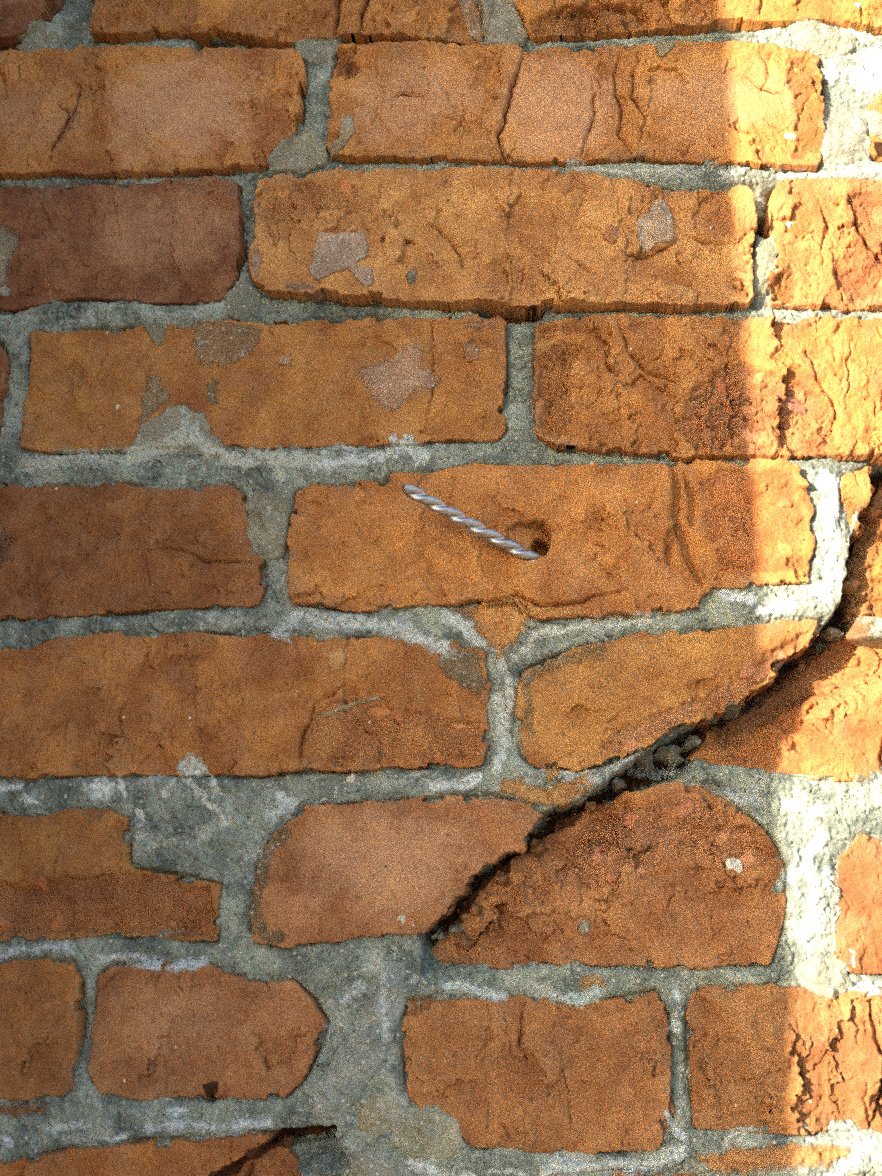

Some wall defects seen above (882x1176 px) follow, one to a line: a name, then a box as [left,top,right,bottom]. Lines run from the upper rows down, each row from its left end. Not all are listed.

crack [623,336,670,382]
crack [430,467,882,951]
crack [519,1014,527,1059]
crack [871,1019,882,1119]
crack [209,1125,336,1176]